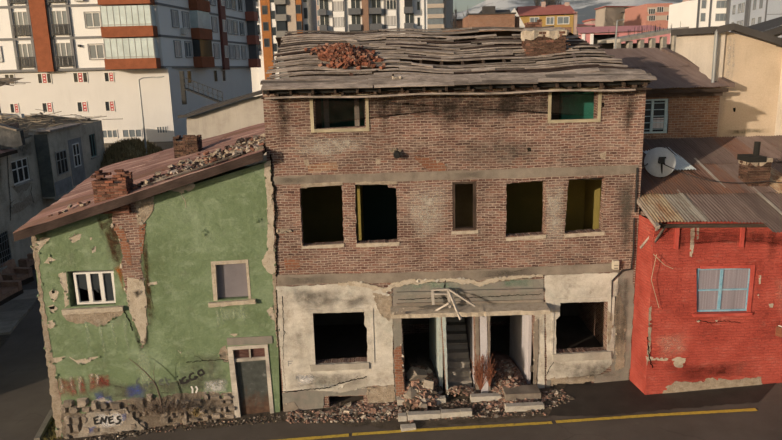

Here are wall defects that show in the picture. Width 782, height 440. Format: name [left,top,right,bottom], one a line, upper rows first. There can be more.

flaking render [30,196,154,439]
flaking render [262,161,301,347]
crack [270,154,367,392]
flaking render [338,274,543,321]
peeling [646,306,687,370]
peeling [663,376,762,394]